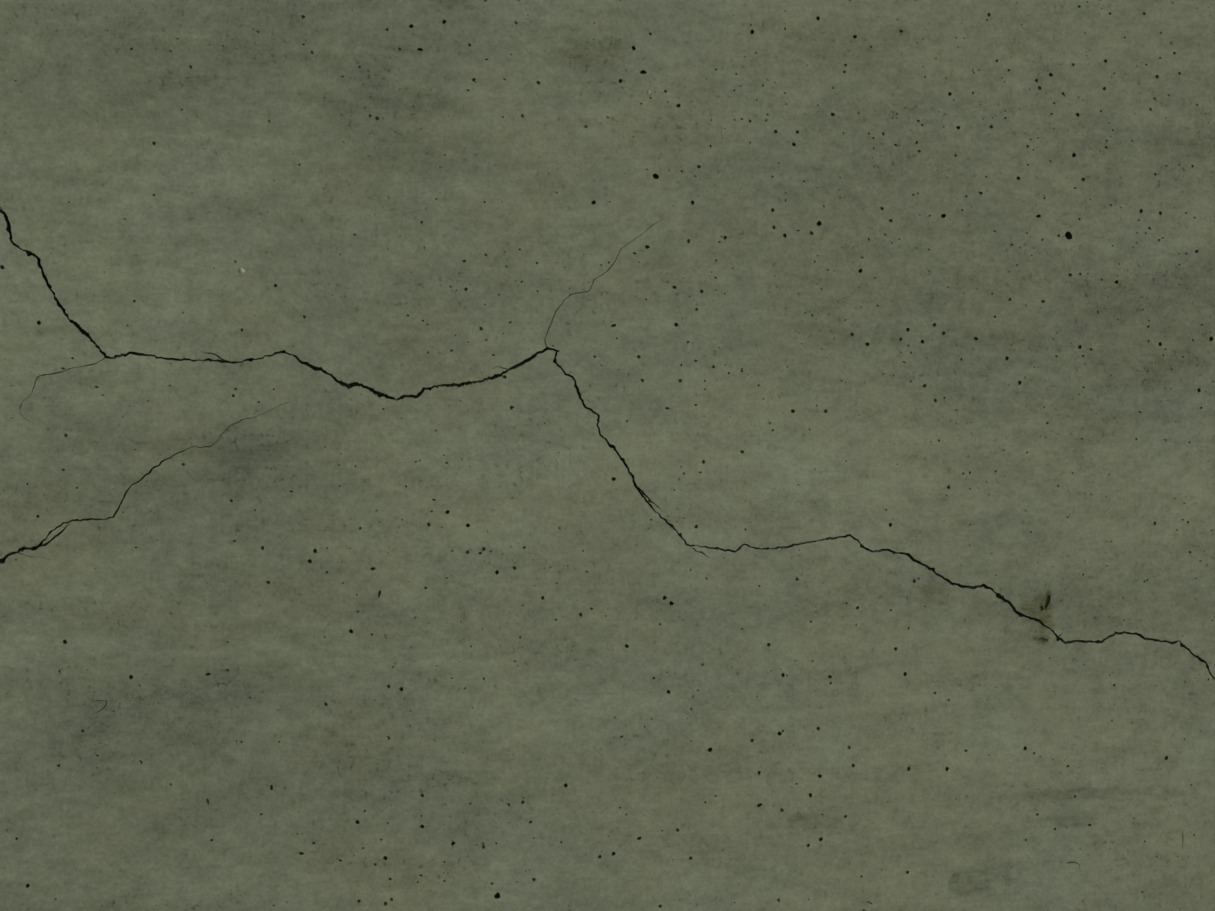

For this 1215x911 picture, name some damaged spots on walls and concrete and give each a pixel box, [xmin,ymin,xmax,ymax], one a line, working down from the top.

crack [0,207,1215,679]